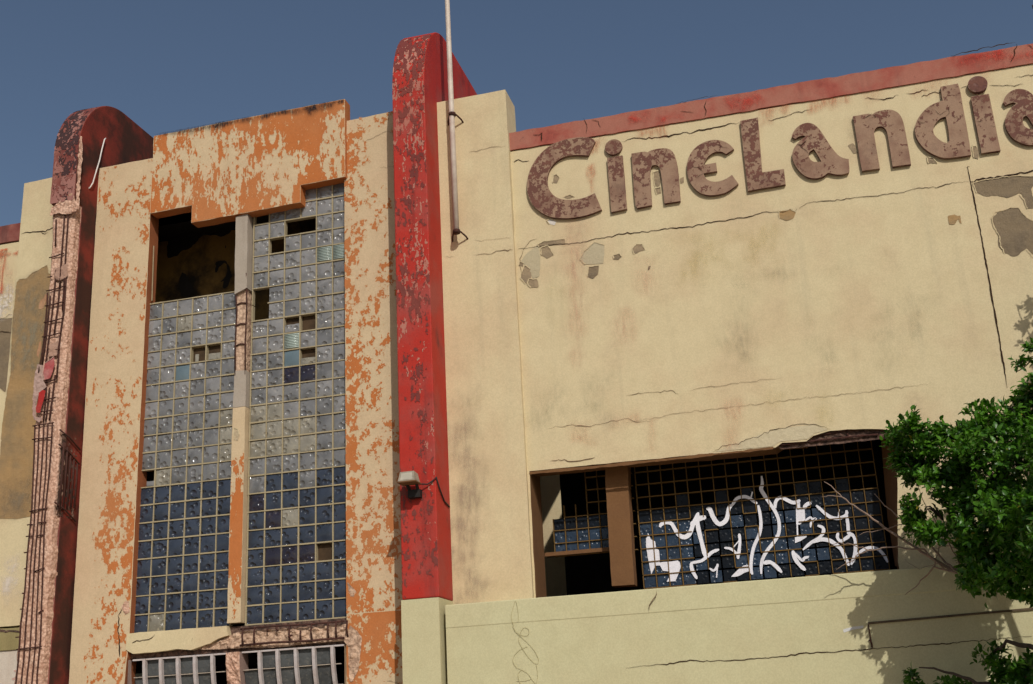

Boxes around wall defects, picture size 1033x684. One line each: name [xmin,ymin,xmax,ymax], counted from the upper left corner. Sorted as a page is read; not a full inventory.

spalling [519,239,565,288]
spalling [587,265,599,279]
spalling [613,244,645,260]
crack [478,167,1033,385]
spalling [973,175,1033,256]
spalling [0,108,90,684]
peeling [83,37,430,684]
crack [550,377,928,450]
spalling [529,430,889,474]
crack [630,636,1032,668]